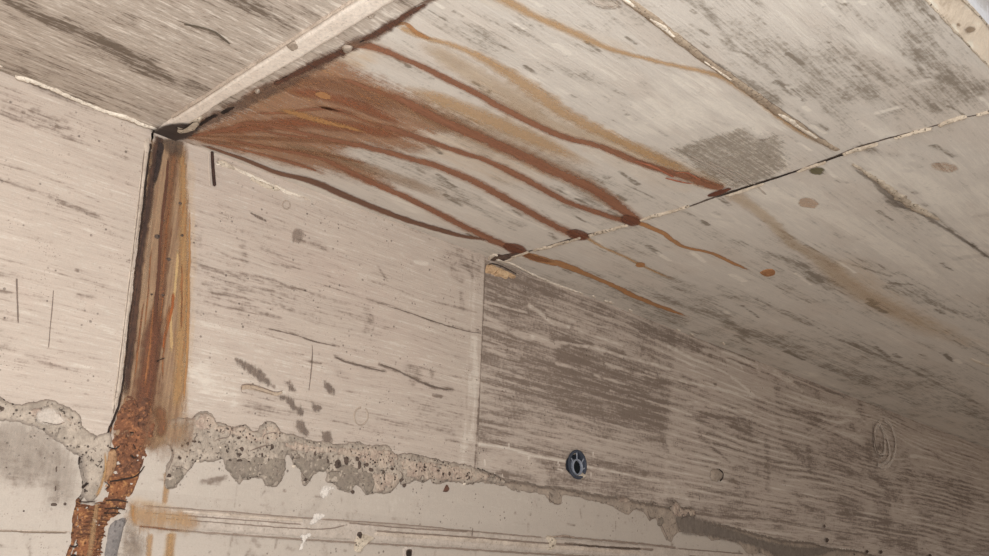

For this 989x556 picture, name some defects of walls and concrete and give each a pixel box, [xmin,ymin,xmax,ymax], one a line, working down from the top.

crack [176,107,235,130]
rust [66,0,746,556]
damp [299,513,325,550]
damp [677,508,833,556]